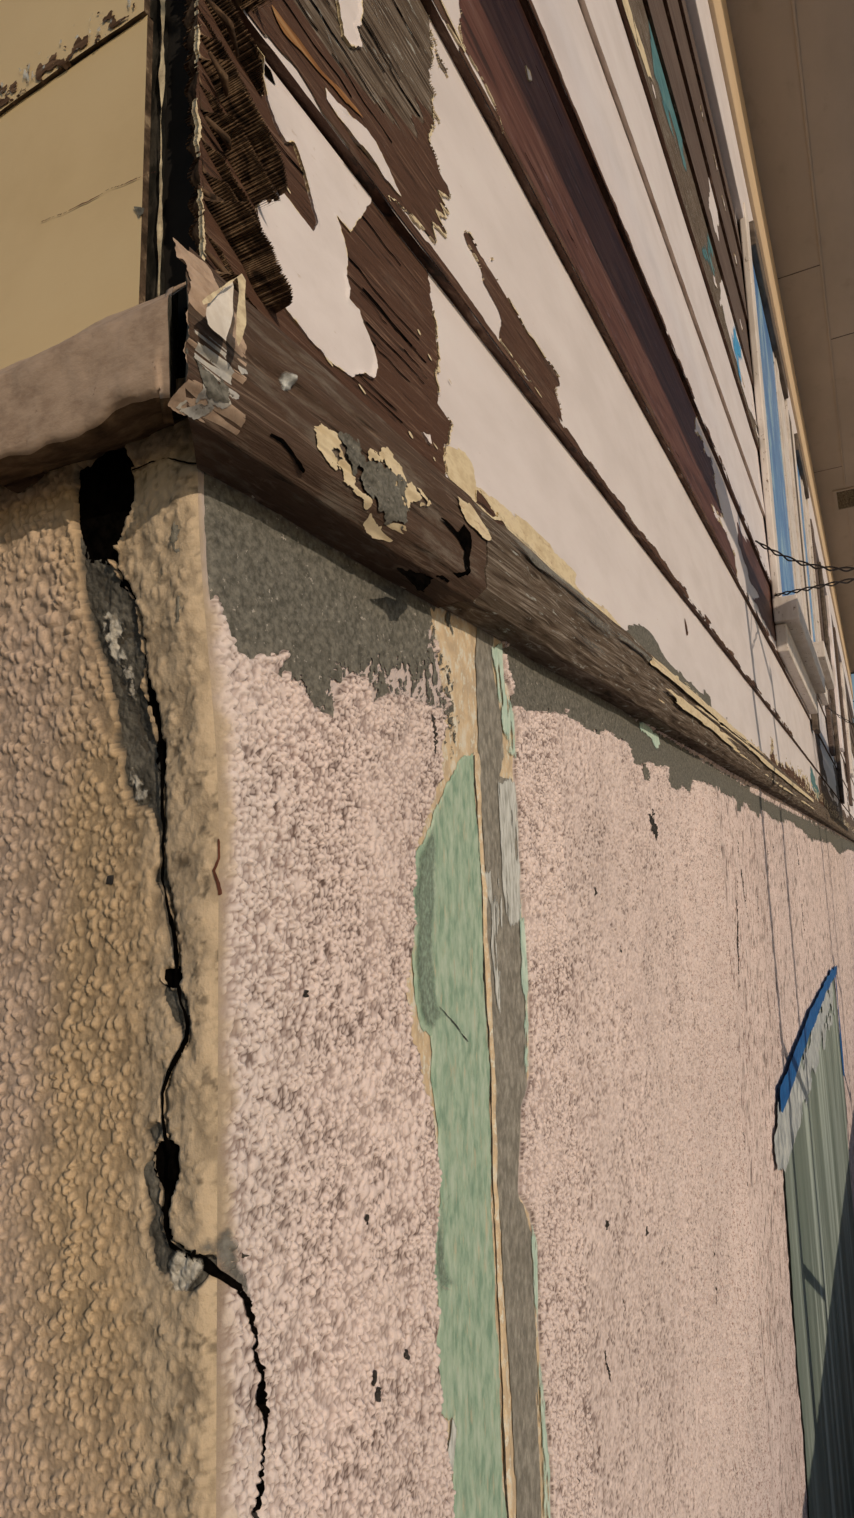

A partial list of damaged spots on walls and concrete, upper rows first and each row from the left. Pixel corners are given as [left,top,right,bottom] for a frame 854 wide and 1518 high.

spalling [81,537,167,842]
crack [78,447,270,1518]
spalling [165,985,191,1032]
spalling [144,1122,217,1291]
peeling [168,0,854,832]
flaking render [204,473,854,1518]